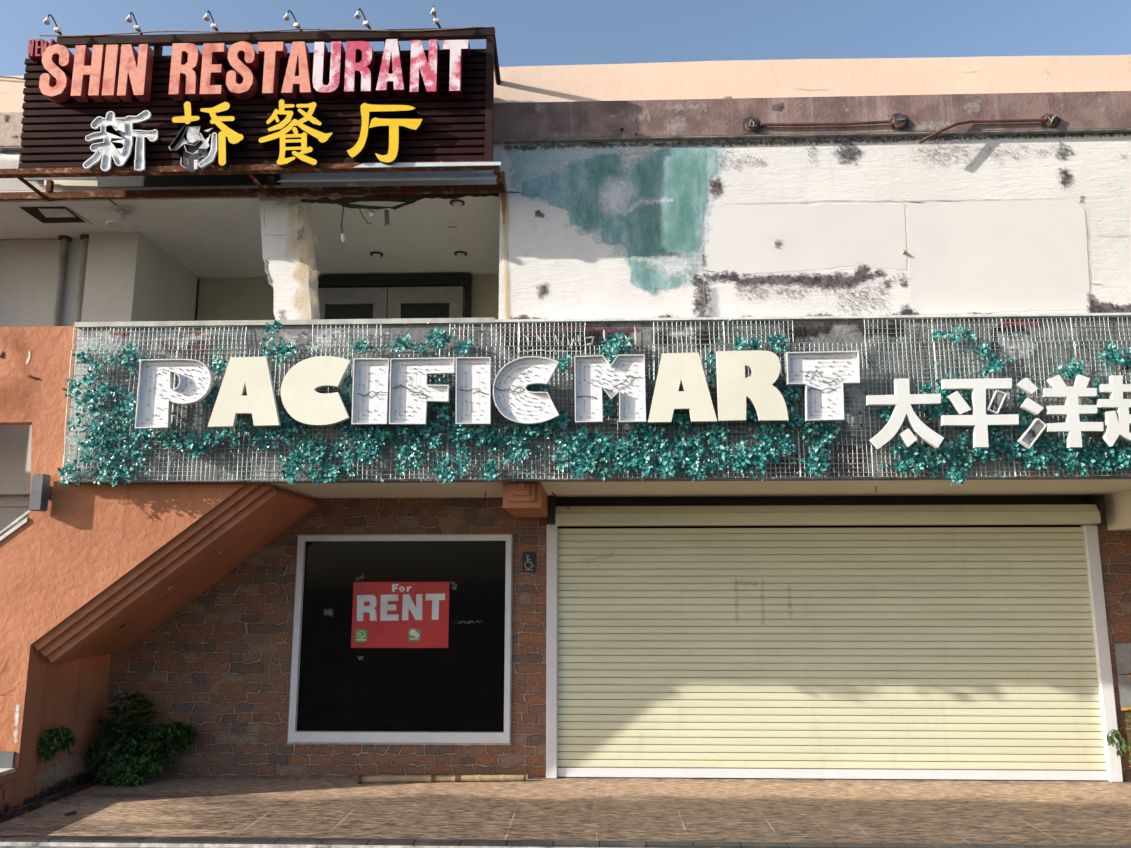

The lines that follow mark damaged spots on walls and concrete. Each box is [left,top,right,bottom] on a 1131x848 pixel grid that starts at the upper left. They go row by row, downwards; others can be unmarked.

leakage [503,132,1131,187]
peeling [507,141,726,294]
leakage [690,255,918,317]